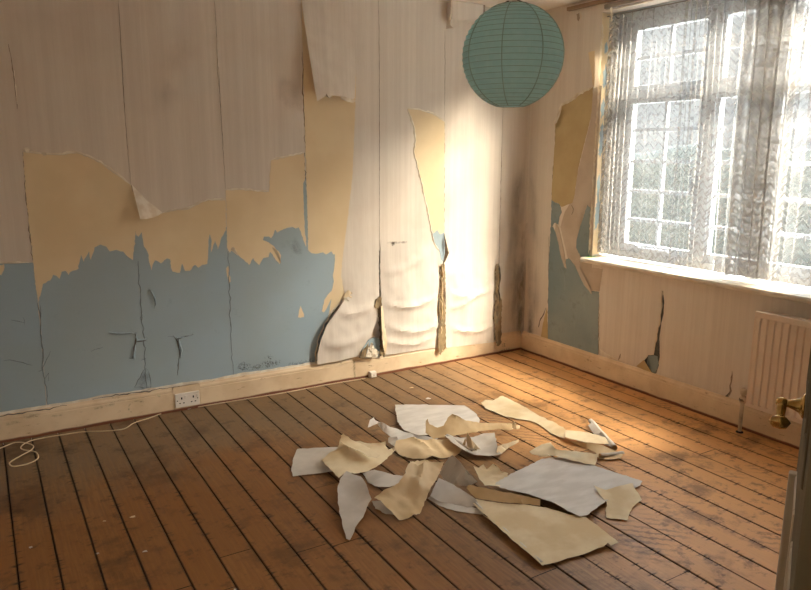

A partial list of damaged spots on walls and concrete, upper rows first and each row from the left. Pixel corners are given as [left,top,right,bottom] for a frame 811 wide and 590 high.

crack [92,266,194,399]